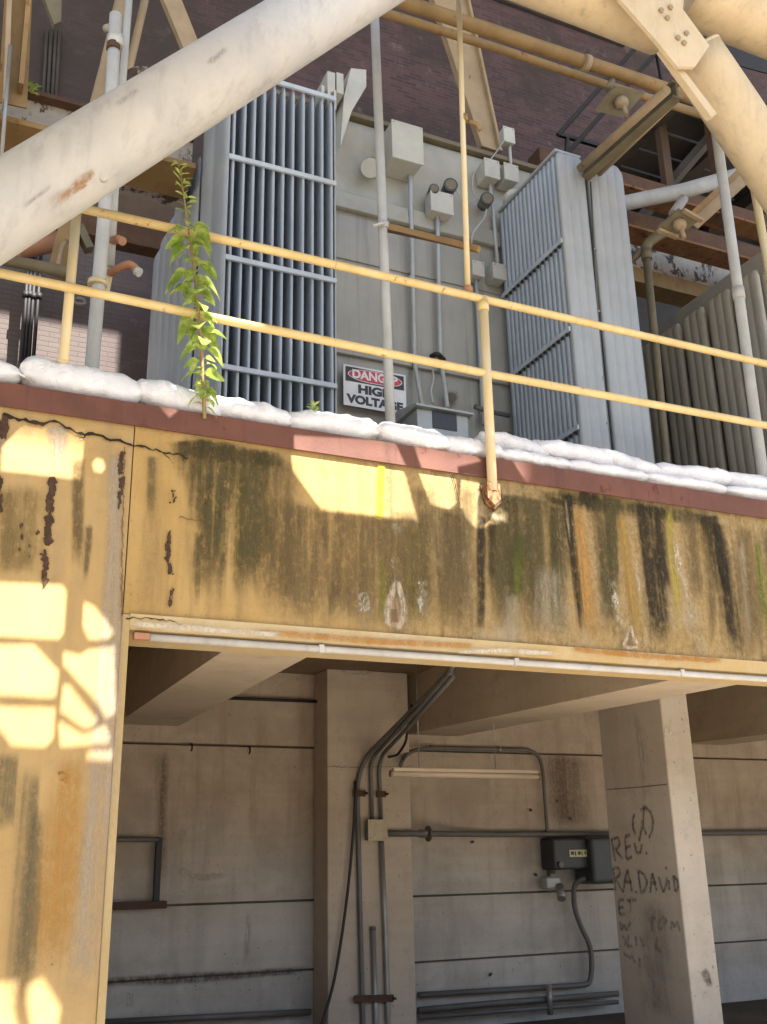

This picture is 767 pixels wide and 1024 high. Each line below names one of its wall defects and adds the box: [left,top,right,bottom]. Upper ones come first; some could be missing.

spalling [19,427,66,587]
crack [2,413,188,625]
spalling [117,451,126,510]
spalling [164,530,174,575]
damp [137,622,277,637]
damp [178,440,430,611]
damp [477,492,758,641]